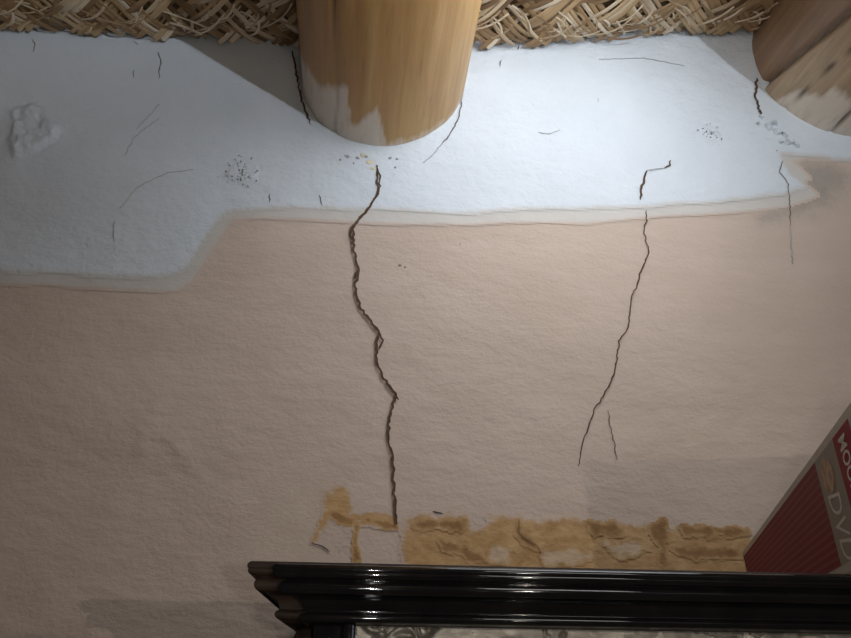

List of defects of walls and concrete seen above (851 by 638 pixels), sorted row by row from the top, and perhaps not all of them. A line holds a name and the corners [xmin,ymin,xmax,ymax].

crack [349,165,399,525]
crack [578,160,671,466]
crack [779,161,793,264]
flaking render [398,508,754,572]